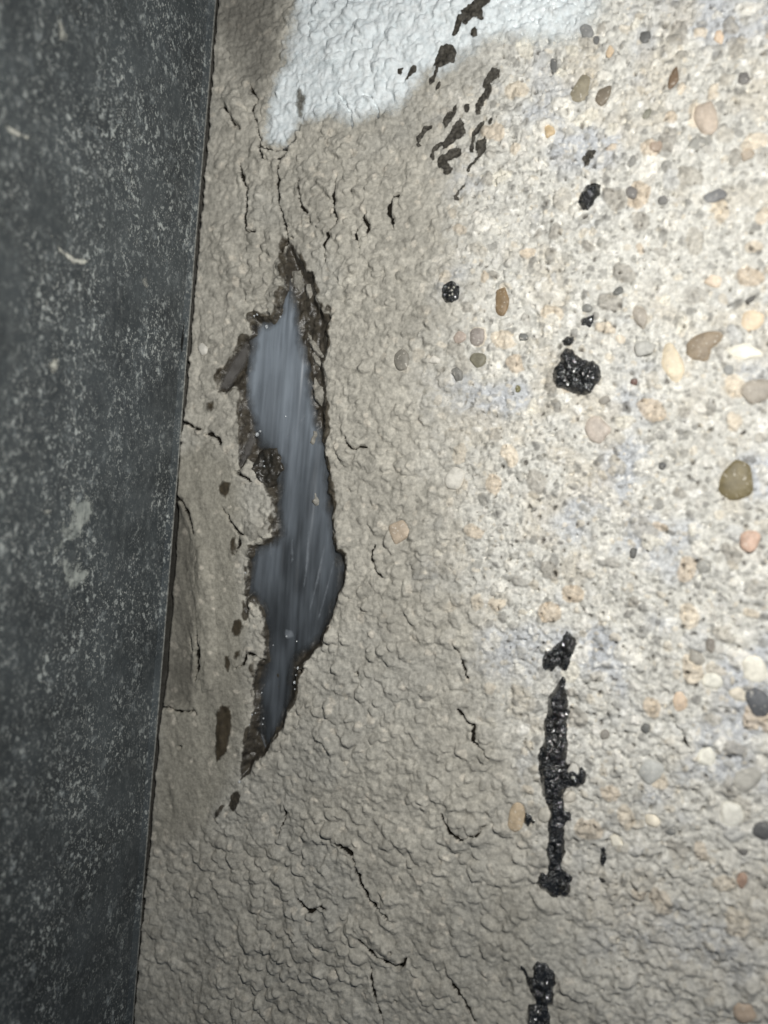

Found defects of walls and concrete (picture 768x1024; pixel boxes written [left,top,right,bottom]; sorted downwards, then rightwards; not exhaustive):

crack [224,88,308,246]
crack [323,191,400,248]
spalling [214,238,346,779]
crack [457,709,478,745]
crack [442,815,485,841]
crack [297,899,325,913]
crack [337,844,387,918]
crack [360,940,407,1014]
crack [452,982,475,1021]